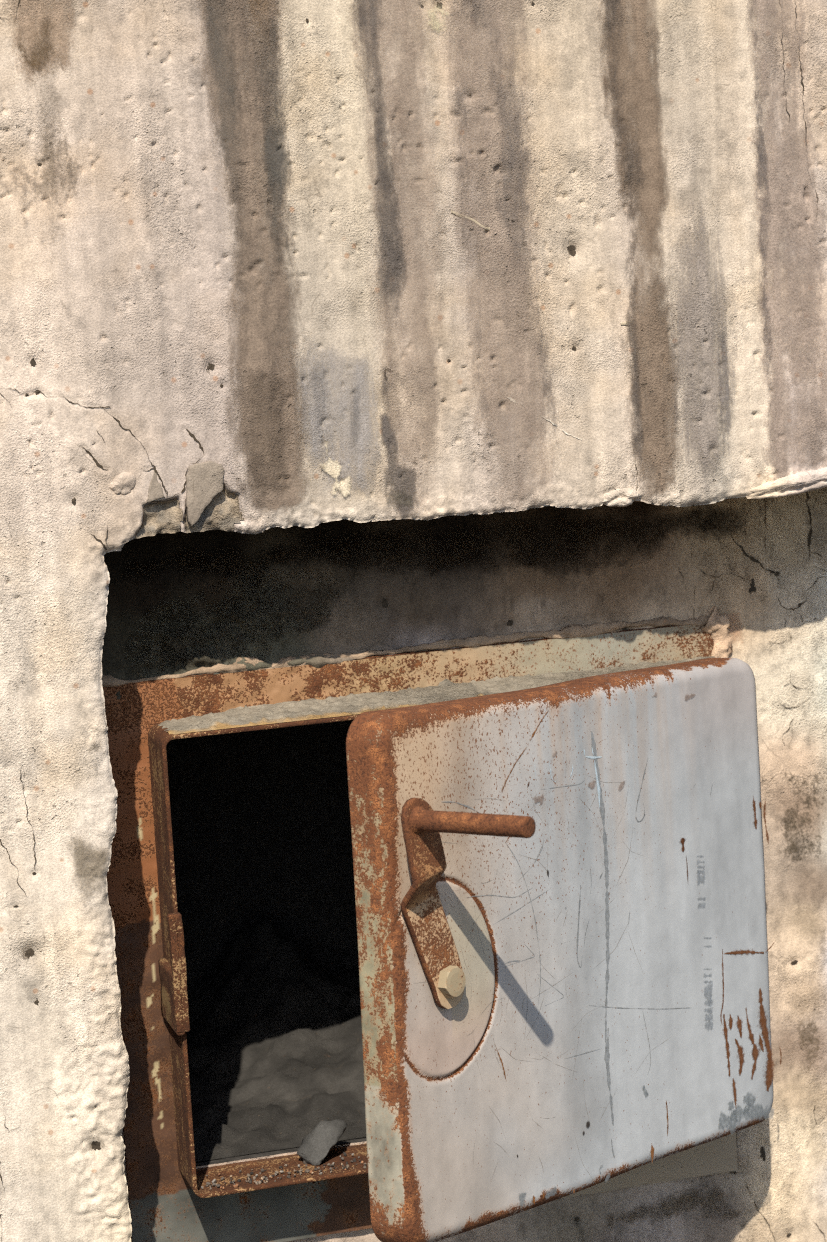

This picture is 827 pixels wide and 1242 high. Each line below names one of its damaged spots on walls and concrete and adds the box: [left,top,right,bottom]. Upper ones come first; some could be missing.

leakage [202,0,435,517]
leakage [601,0,733,494]
leakage [750,0,827,480]
crack [0,388,204,503]
flaking render [136,461,245,539]
crack [679,492,826,643]
corrosion [753,797,769,844]
corrosion [721,942,782,1105]